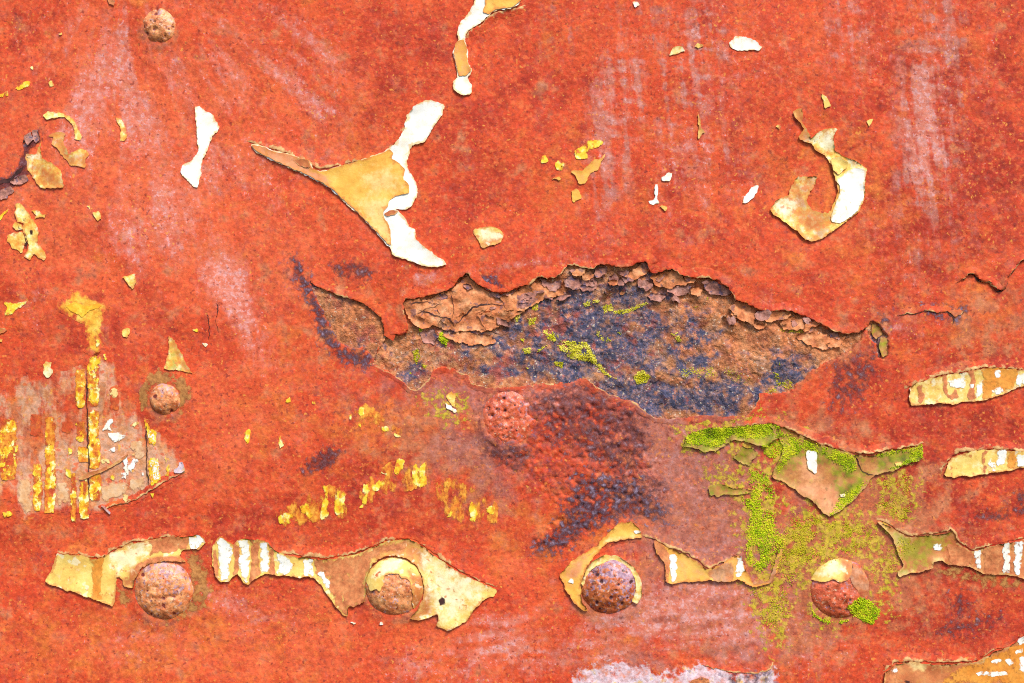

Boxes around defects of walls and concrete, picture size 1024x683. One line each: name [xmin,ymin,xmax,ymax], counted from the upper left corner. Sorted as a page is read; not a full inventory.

peeling [181,106,219,187]
peeling [246,93,446,267]
peeling [771,108,867,241]
crack [897,304,963,323]
crack [960,254,1024,292]
peeling [0,339,189,521]
corrosion [292,251,889,557]
peeling [903,359,1024,406]
corrosion [980,492,1024,520]
peeling [45,526,499,631]
peeling [560,521,786,611]
corrosion [936,589,1001,635]